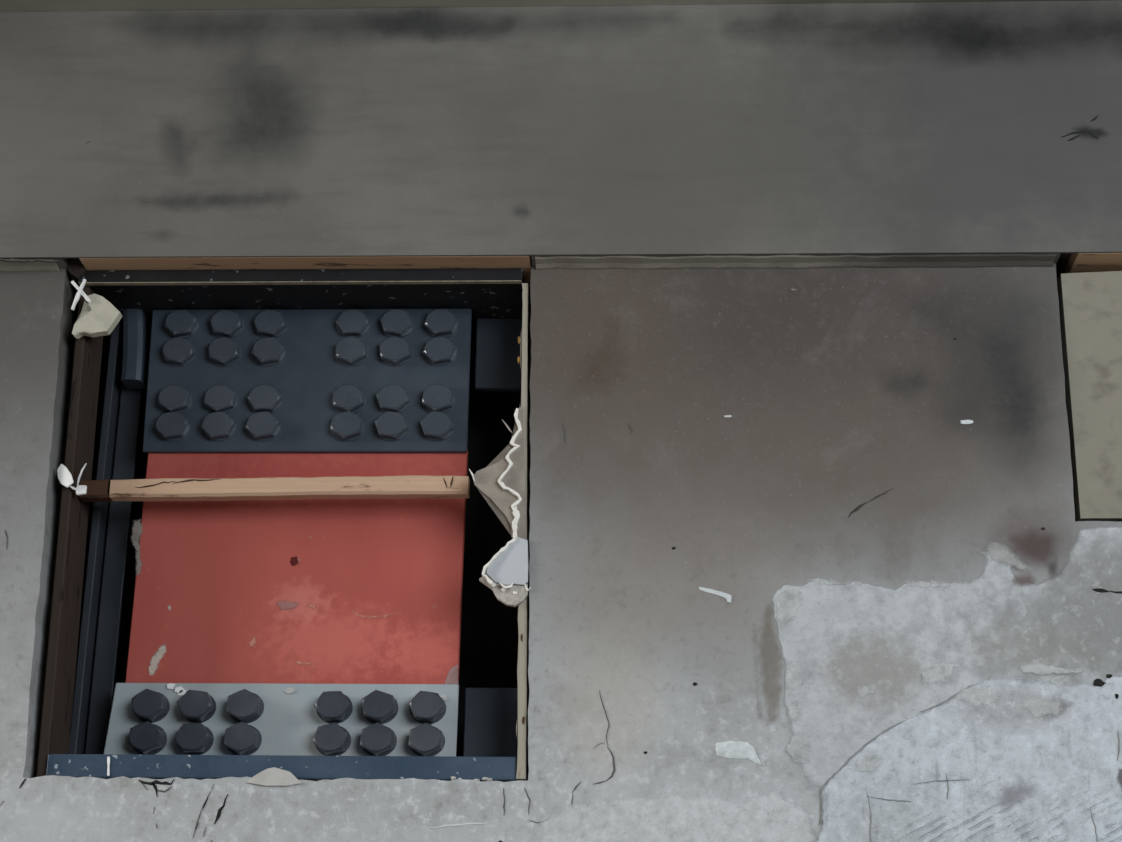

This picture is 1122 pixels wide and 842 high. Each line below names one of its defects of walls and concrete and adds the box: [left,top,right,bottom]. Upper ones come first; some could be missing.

spalling [135,342,150,479]
spalling [114,501,143,691]
spalling [444,341,531,781]
crack [503,690,616,823]
peeling [533,527,1122,842]
crack [820,684,972,824]
crack [867,774,970,842]